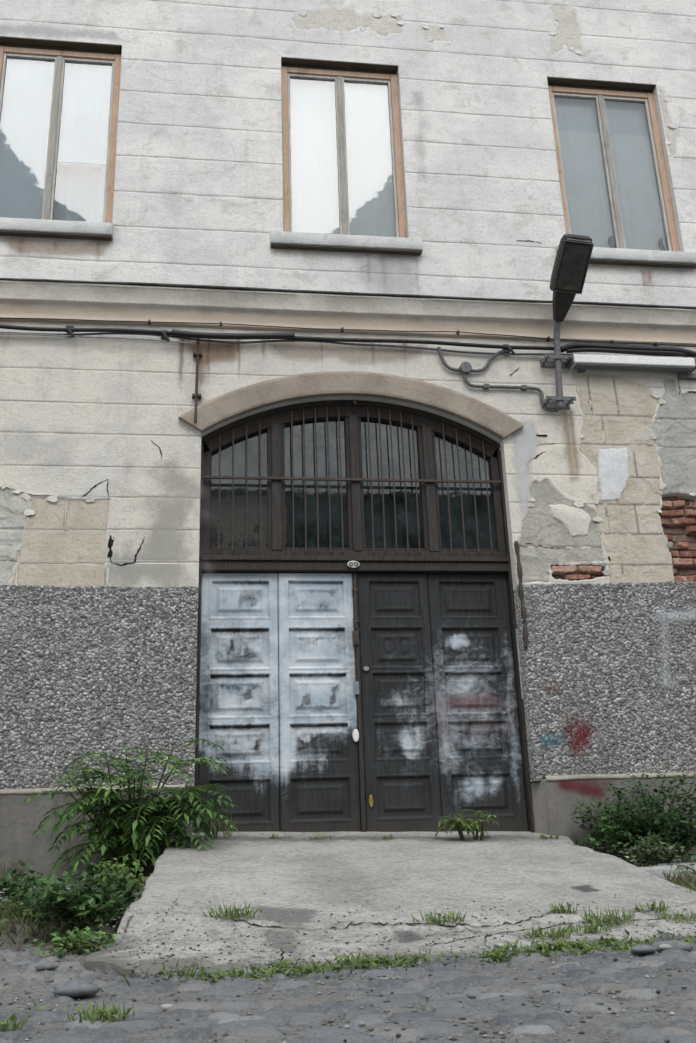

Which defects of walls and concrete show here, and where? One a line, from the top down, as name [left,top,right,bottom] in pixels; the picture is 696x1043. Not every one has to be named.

peeling [291,10,404,36]
peeling [549,5,586,56]
crack [6,479,109,498]
peeling [651,379,696,582]
crack [109,537,144,566]
peeling [515,480,611,583]
crack [135,898,603,961]